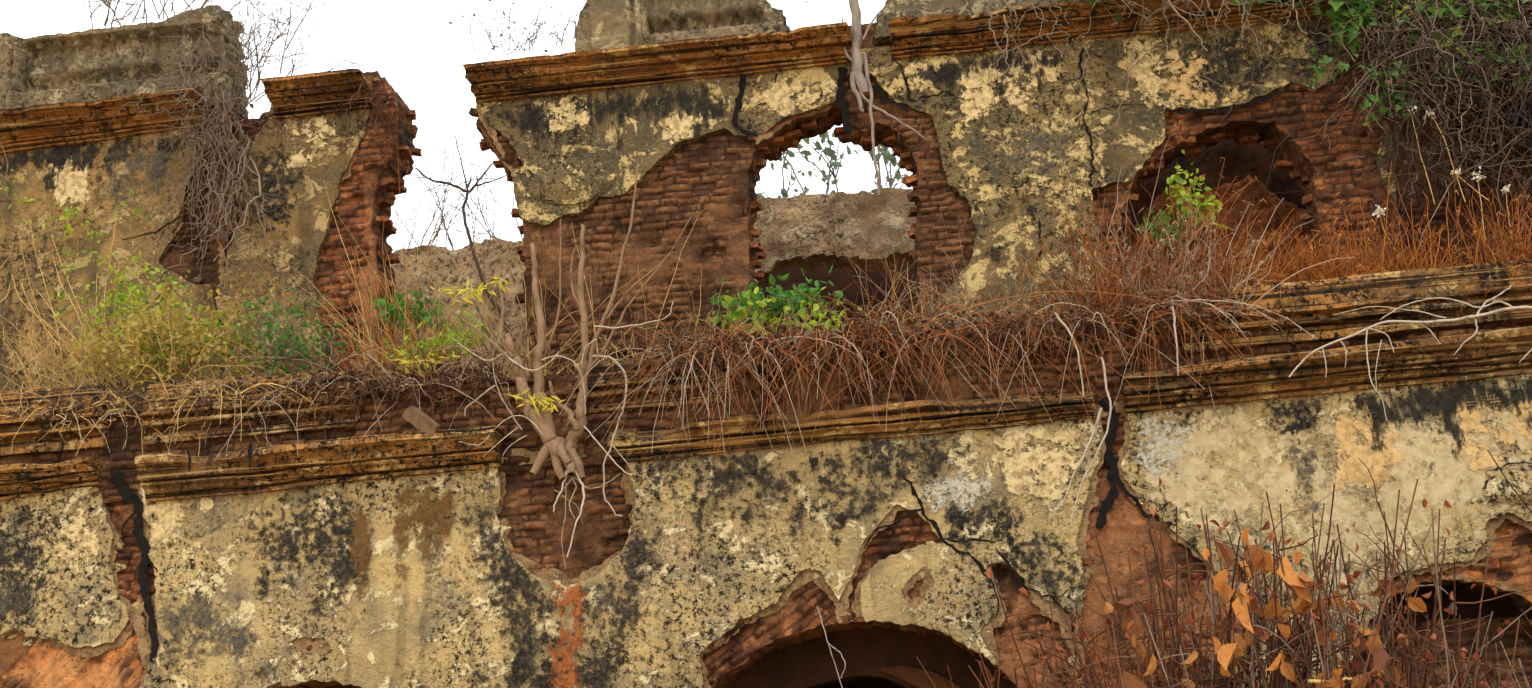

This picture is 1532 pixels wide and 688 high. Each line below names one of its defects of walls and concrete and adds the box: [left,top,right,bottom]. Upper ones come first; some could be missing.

water stain [502,82,727,150]
flaking render [957,46,1058,127]
spalling [522,75,977,376]
water stain [0,505,64,629]
spalling [0,459,214,688]
crack [109,471,160,662]
spalling [497,446,635,587]
water stain [462,426,1085,688]
crack [864,477,1077,659]
flaking render [700,390,1532,688]
crack [1095,397,1150,529]
water stain [1339,377,1532,459]